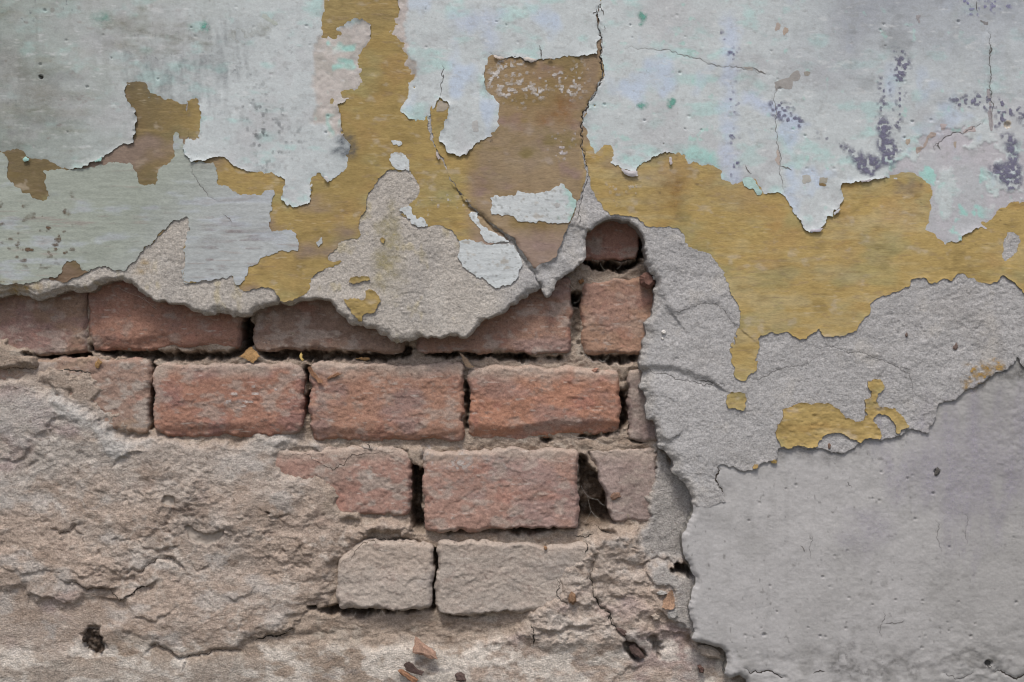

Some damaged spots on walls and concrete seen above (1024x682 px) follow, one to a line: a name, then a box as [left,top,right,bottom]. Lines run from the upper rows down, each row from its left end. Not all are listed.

crack [578,0,791,221]
spalling [0,0,1024,508]
crack [574,524,627,640]